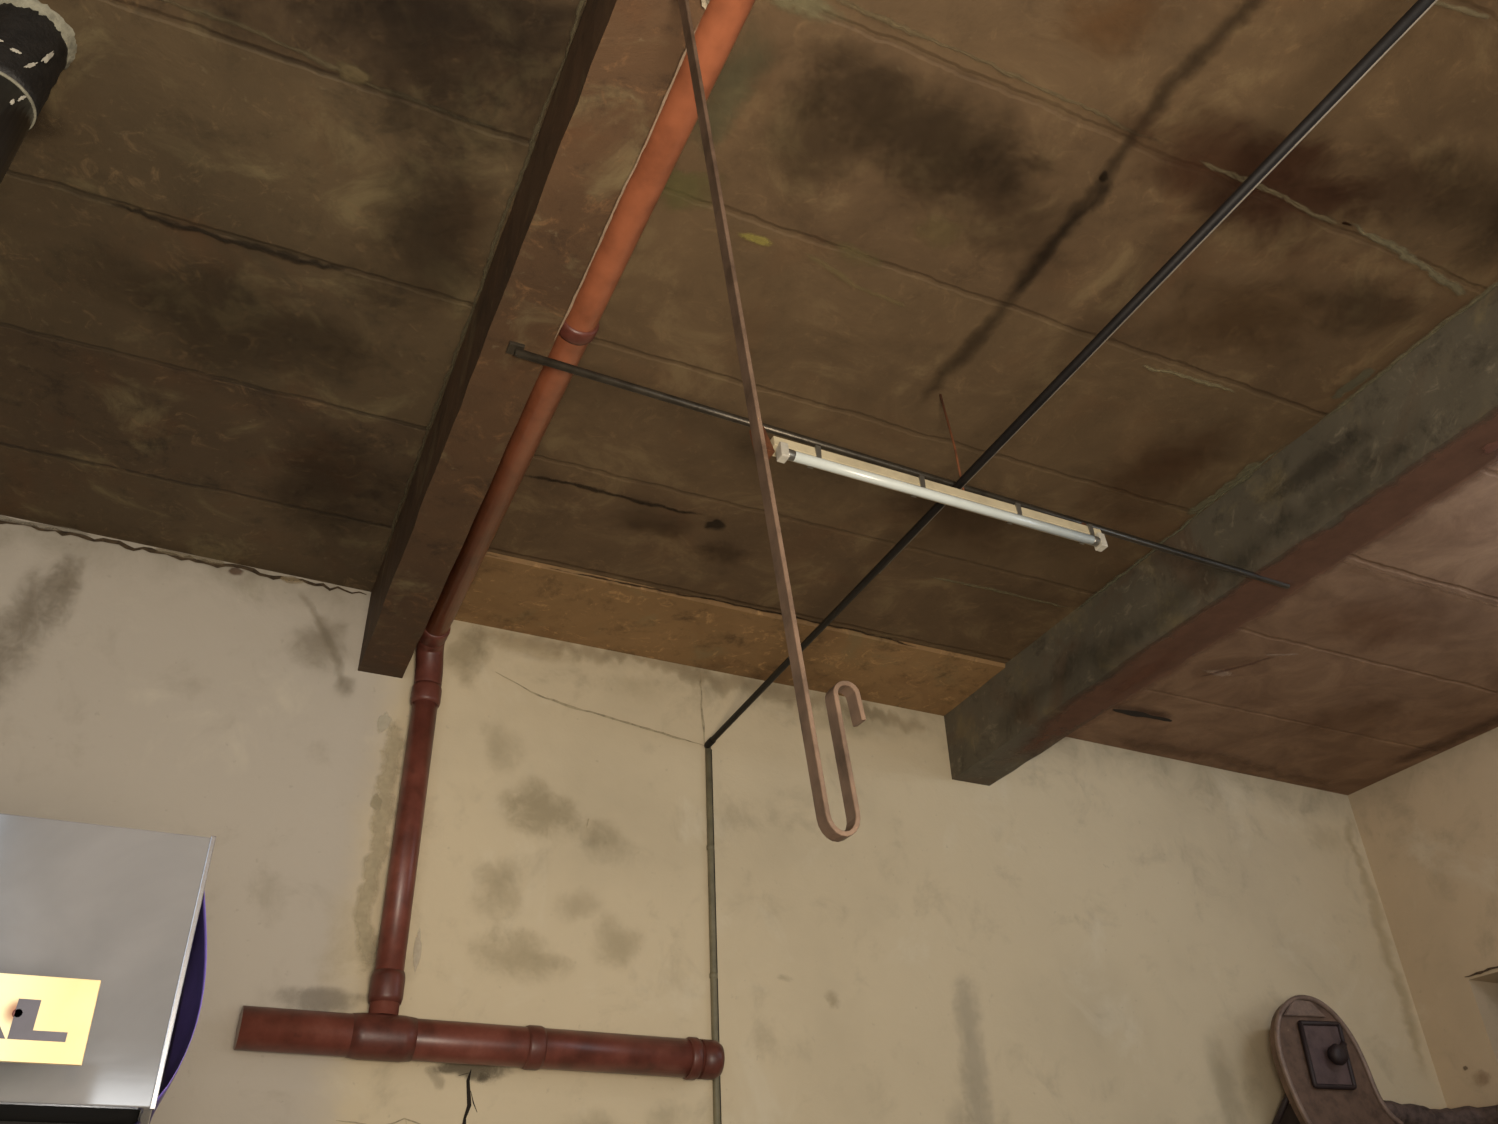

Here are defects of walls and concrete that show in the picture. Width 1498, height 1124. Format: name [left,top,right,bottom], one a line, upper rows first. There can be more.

water stain [1202,161,1337,224]
crack [336,1116,420,1124]
crack [458,1071,477,1124]